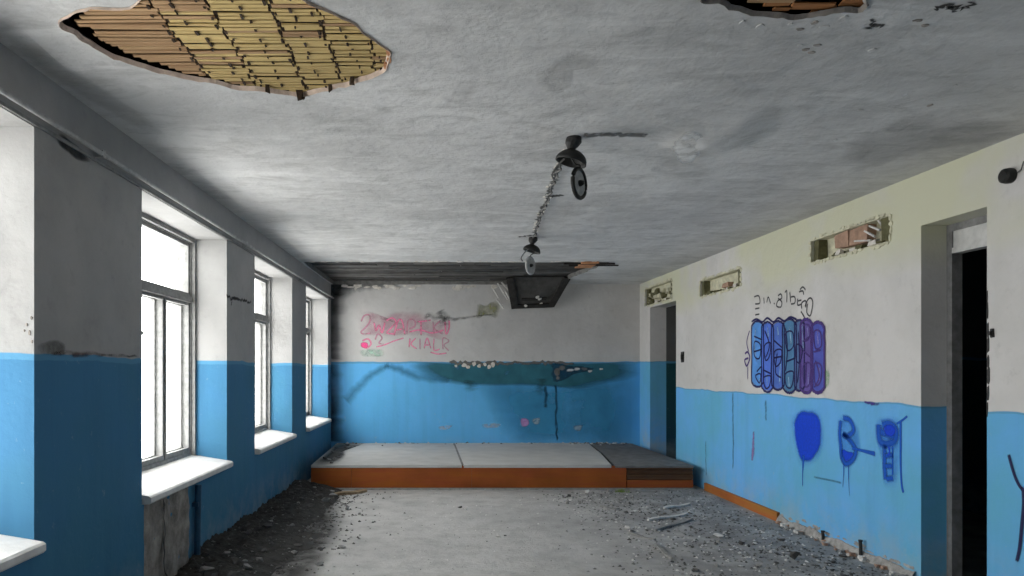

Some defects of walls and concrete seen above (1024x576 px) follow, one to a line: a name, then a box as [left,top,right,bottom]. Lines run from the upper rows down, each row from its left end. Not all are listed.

spalling [700,0,869,31]
spalling [58,0,392,97]
spalling [808,213,893,265]
crack [227,295,251,305]
spalling [644,278,673,307]
spalling [698,266,742,299]
peeling [450,360,603,382]
damp [423,363,626,439]
spalling [775,514,916,576]